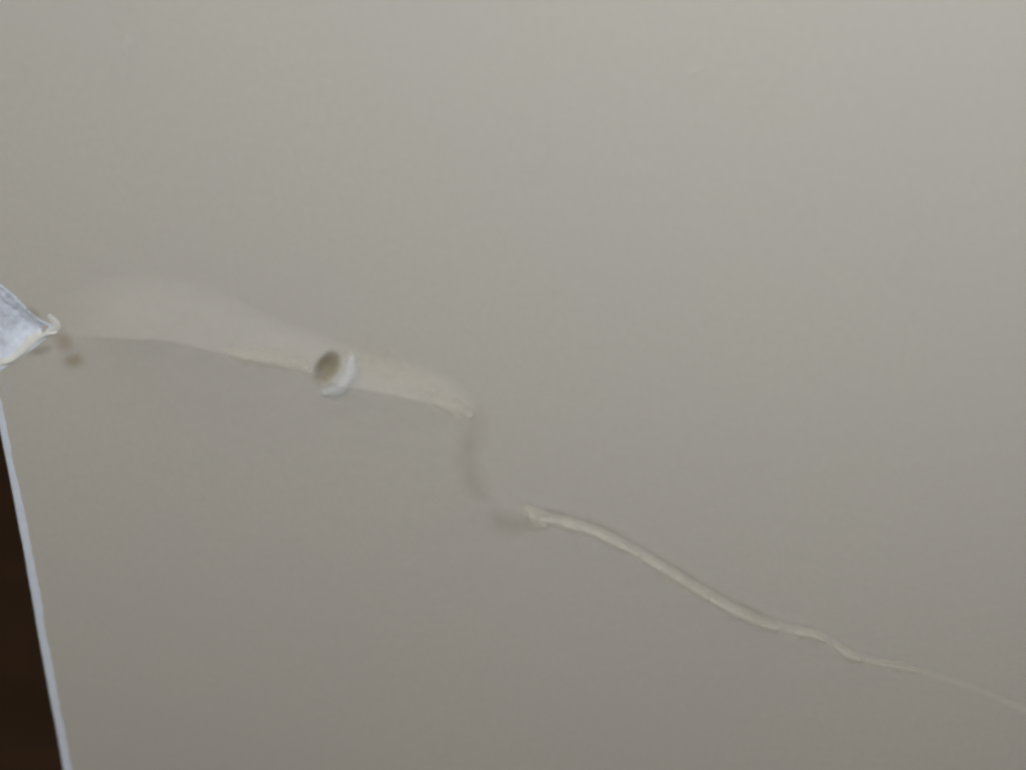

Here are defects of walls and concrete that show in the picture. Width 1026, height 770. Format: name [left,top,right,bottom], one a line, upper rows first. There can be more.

flaking render [0,284,60,371]
peeling [0,400,72,770]